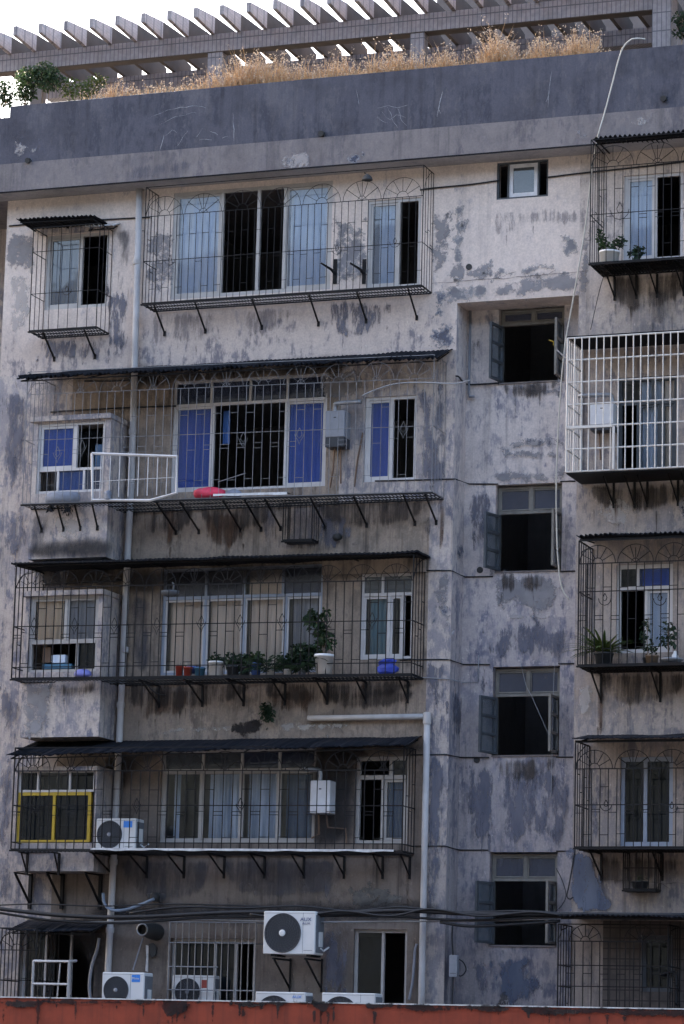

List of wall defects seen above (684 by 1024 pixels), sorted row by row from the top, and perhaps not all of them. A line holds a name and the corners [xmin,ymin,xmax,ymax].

leakage [331,302,391,347]
leakage [489,615,565,662]
leakage [164,711,268,738]
leakage [467,766,492,852]
leakage [504,770,611,912]